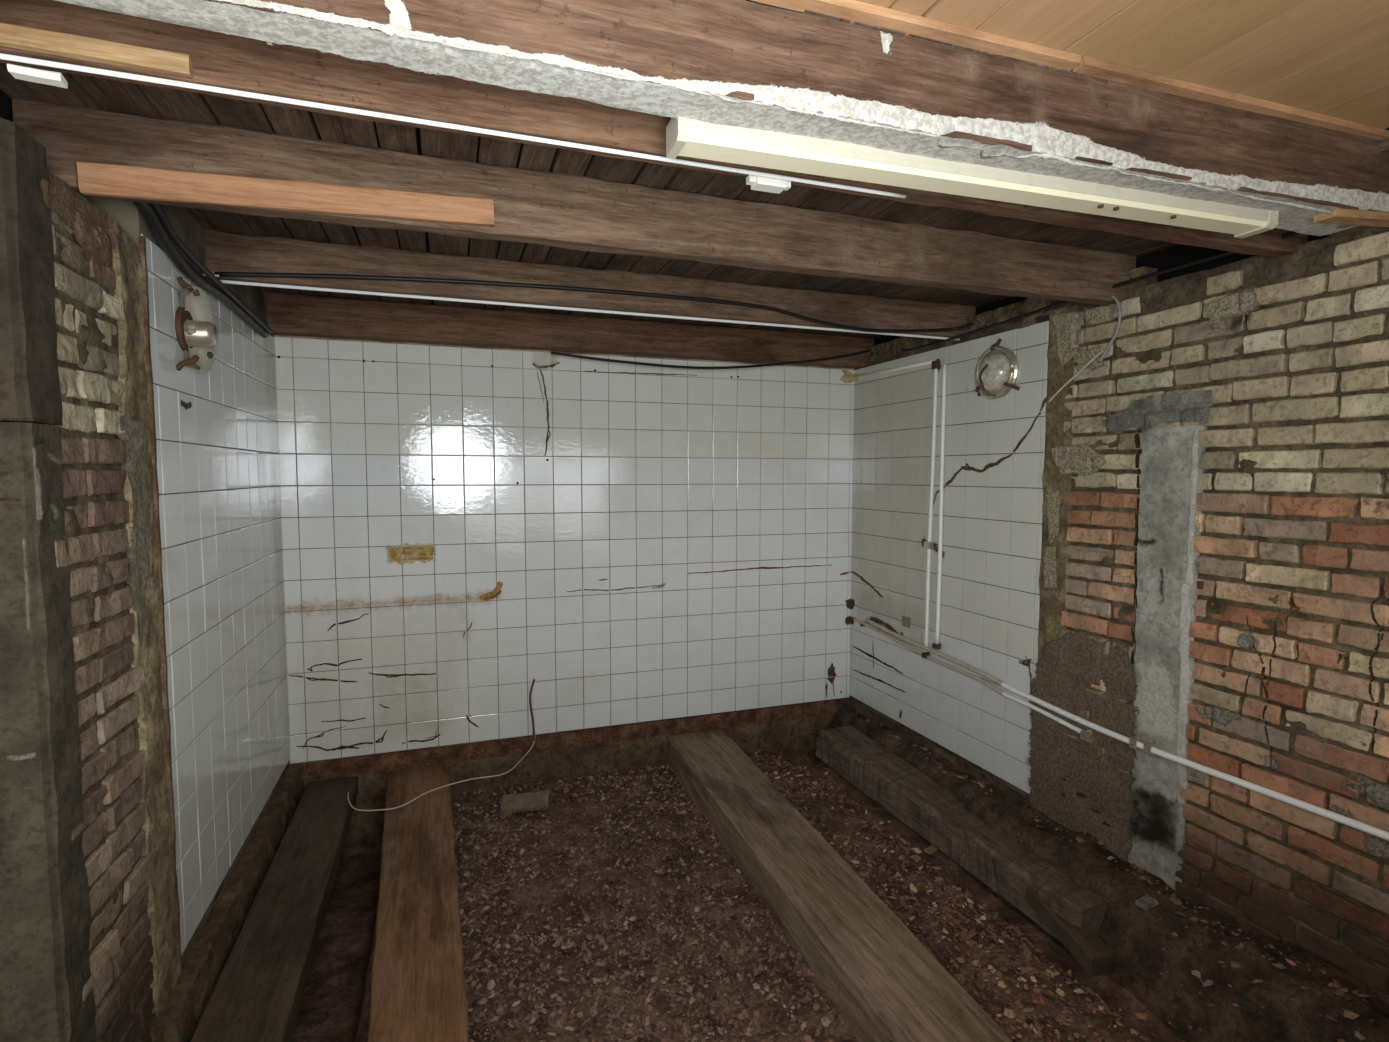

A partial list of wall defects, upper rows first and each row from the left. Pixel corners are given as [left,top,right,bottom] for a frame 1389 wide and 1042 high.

peeling [55,0,1389,236]
crack [933,393,1050,505]
crack [289,613,479,751]
corrosion [400,582,502,605]
leakage [1130,430,1199,846]